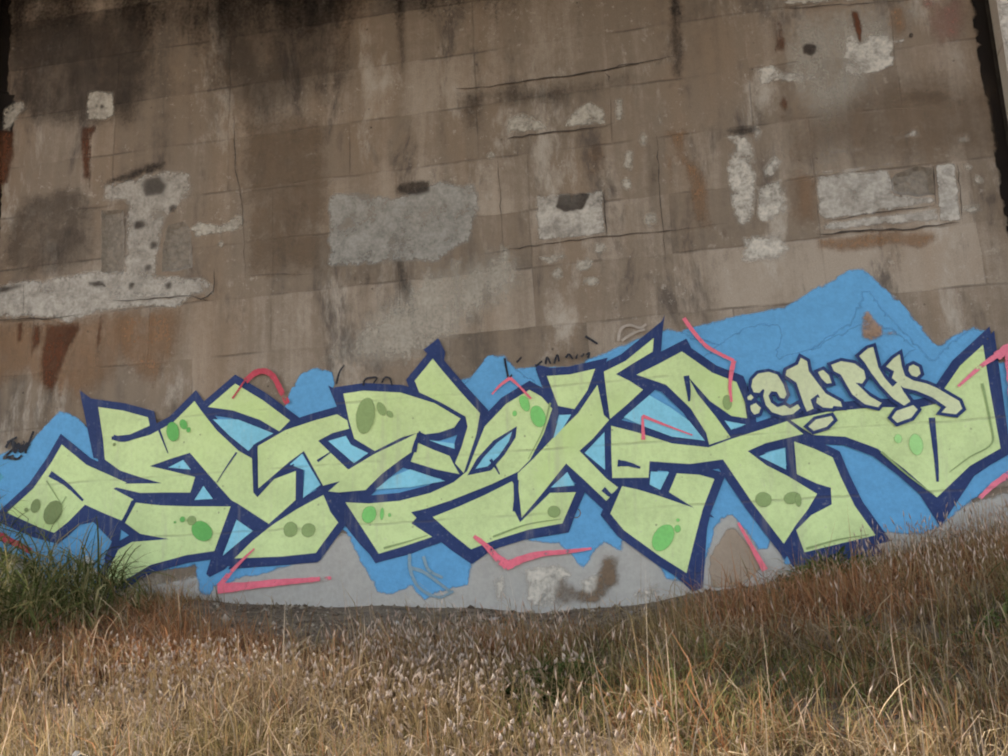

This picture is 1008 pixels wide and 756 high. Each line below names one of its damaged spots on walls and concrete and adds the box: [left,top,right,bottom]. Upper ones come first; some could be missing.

rust [852,12,862,41]
damp [0,0,148,135]
peeling [508,115,544,132]
peeling [566,103,605,126]
rust [0,132,13,184]
rust [82,127,95,178]
damp [112,163,164,195]
damp [397,181,429,194]
spalling [890,166,935,197]
peeling [826,210,937,229]
spalling [101,210,125,275]
rust [33,324,76,388]